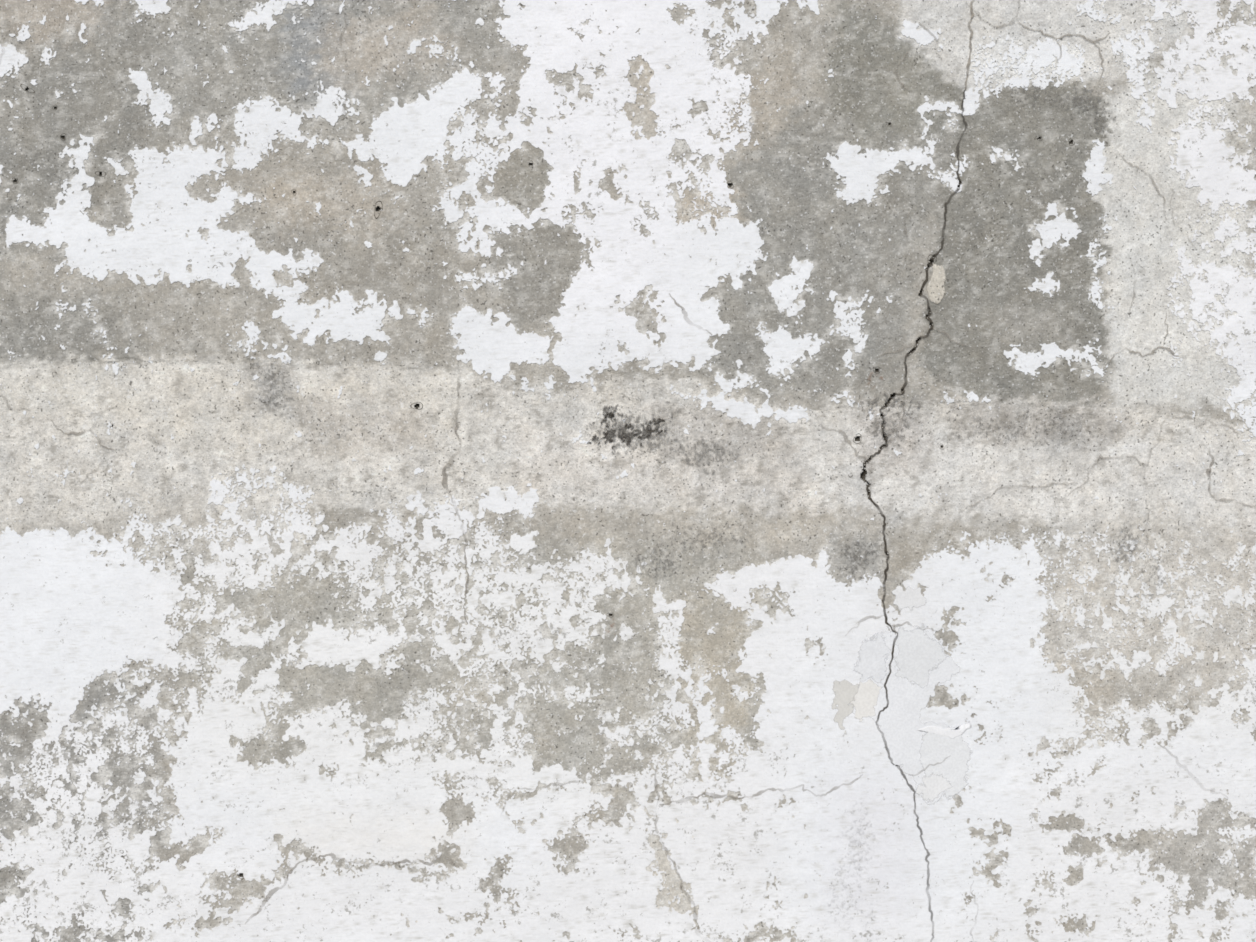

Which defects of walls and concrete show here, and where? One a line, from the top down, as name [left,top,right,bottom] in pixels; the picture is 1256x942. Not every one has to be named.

crack [1019,22,1107,58]
peeling [542,63,607,120]
peeling [619,54,687,143]
peeling [566,154,659,244]
peeling [610,284,672,348]
crack [860,2,974,720]
crack [901,770,925,847]
peeling [191,770,476,938]
peeling [438,854,531,939]
peeling [645,826,803,942]
peeling [961,818,1012,911]
peeling [1010,789,1256,942]